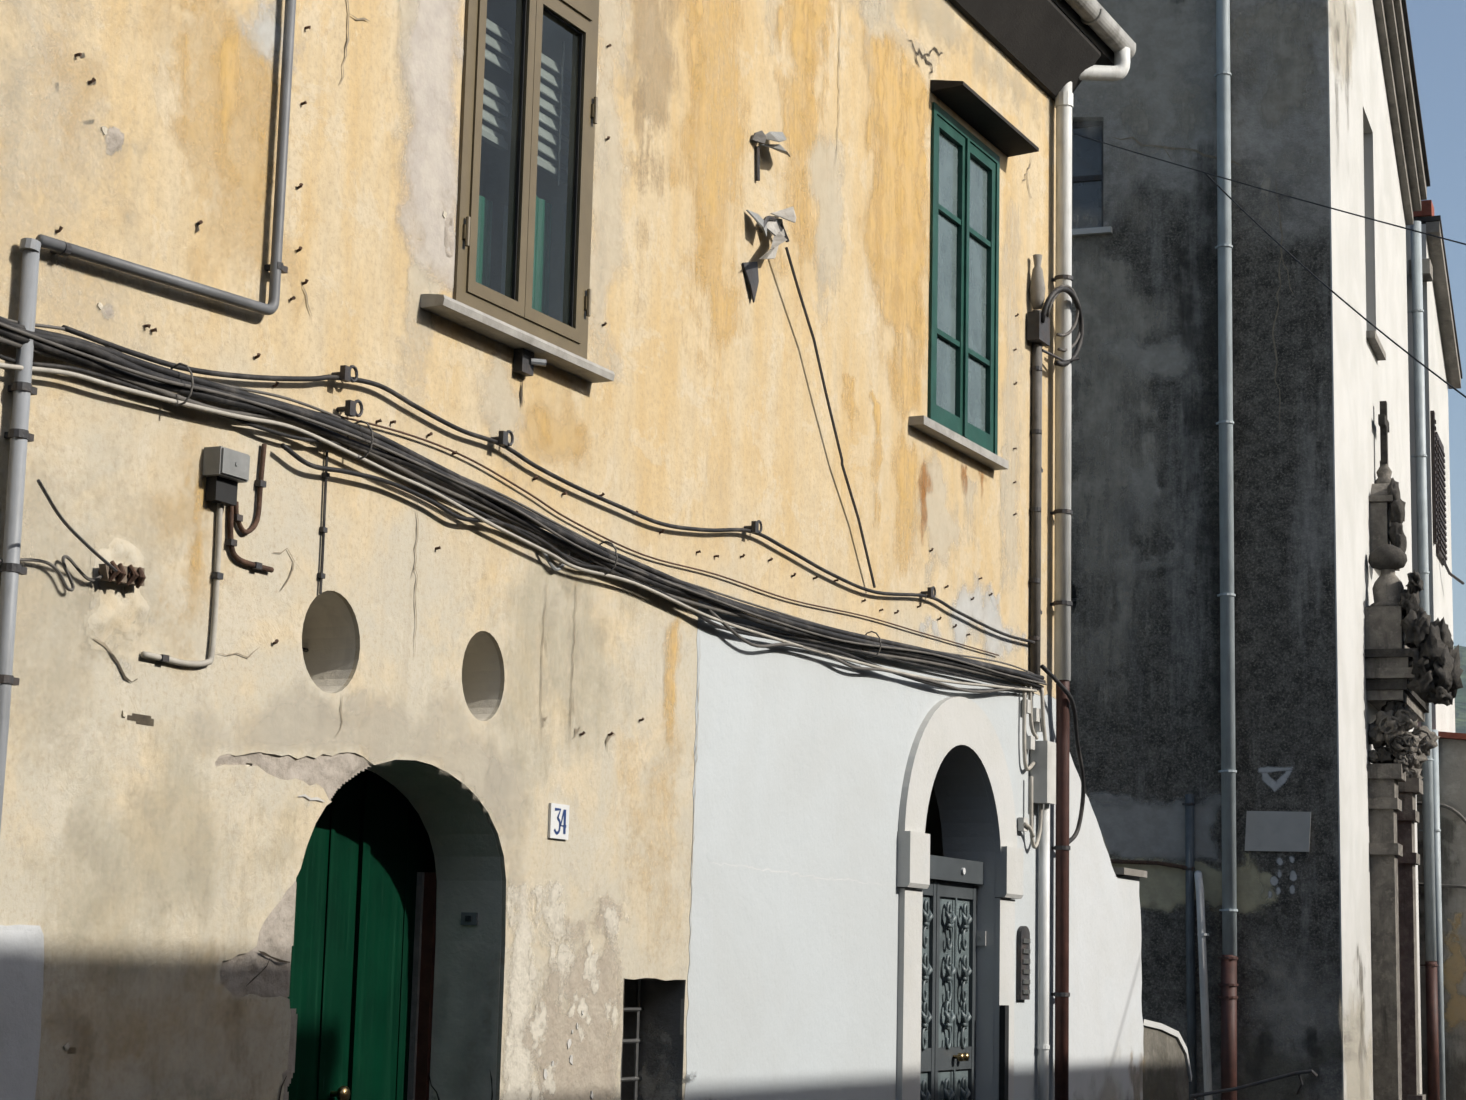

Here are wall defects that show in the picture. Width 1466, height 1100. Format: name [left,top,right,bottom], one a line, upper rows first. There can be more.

water stain [671,0,744,343]
water stain [778,0,842,283]
crack [835,4,843,157]
water stain [864,0,939,411]
crack [908,40,943,73]
water stain [1073,0,1212,155]
water stain [872,392,959,571]
water stain [1071,214,1217,696]
spalling [215,752,372,800]
peeling [502,881,622,1100]